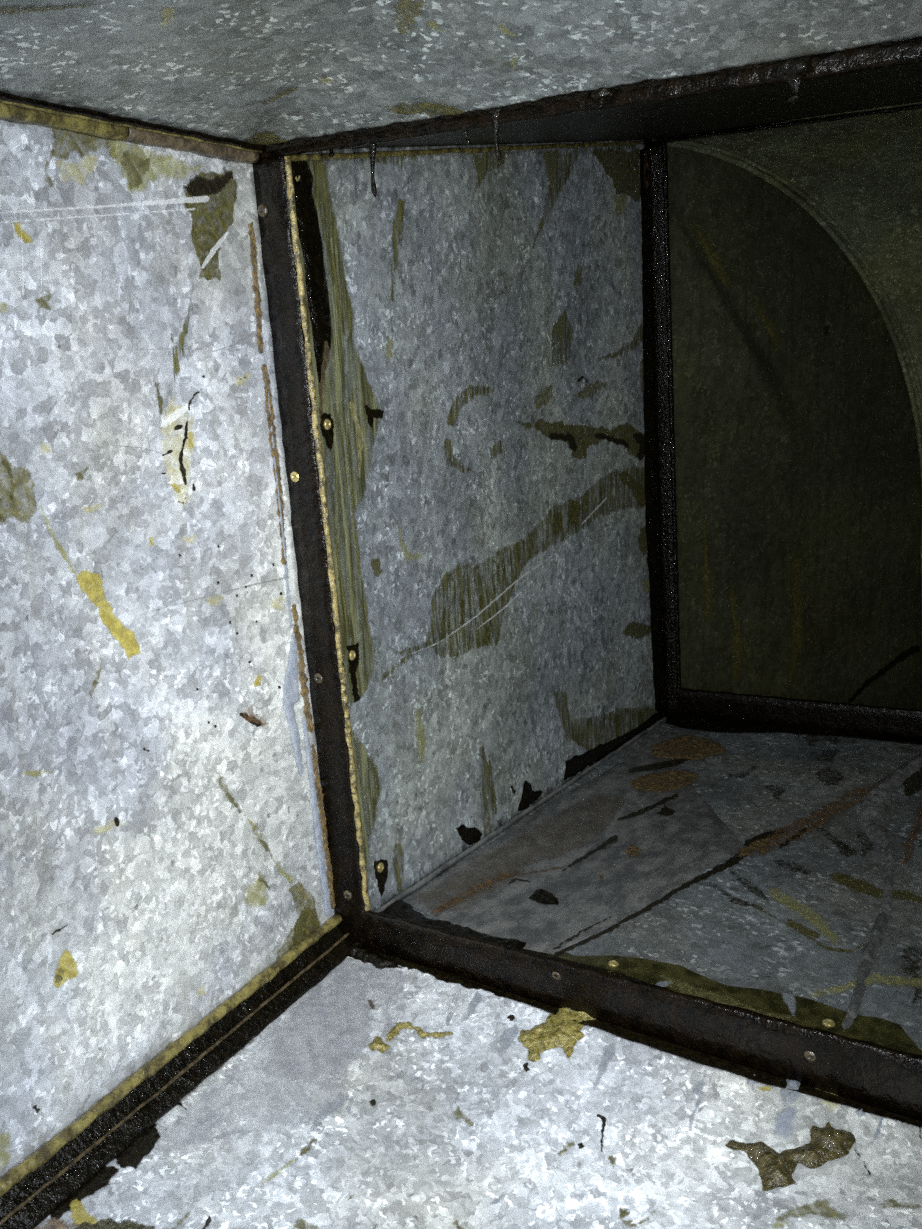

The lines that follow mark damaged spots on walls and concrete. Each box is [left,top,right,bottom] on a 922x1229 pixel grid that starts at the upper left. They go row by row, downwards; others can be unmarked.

damp [184,171,233,198]
corrosion [248,222,287,565]
damp [595,433,645,459]
damp [0,460,15,500]
damp [552,501,581,534]
damp [441,596,484,640]
corrosion [291,604,335,909]